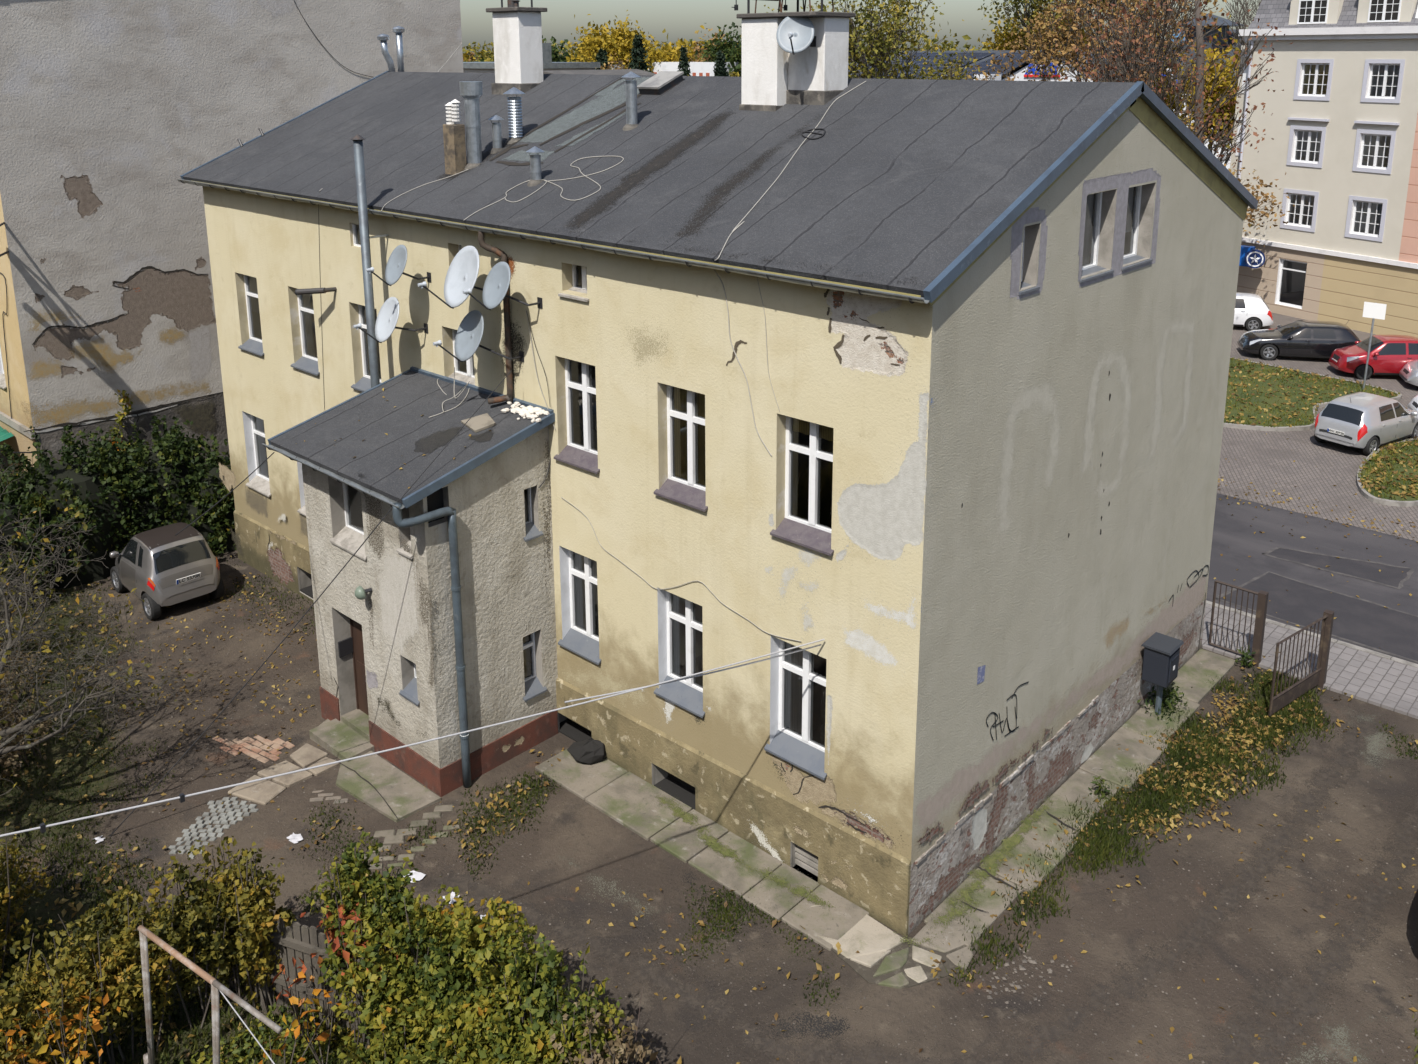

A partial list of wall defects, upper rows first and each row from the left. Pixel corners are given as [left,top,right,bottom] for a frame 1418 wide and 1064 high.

flaking render [60,174,103,219]
leakage [437,135,533,181]
leakage [481,106,873,279]
flaking render [20,256,216,433]
crack [726,340,747,366]
flaking render [824,289,909,377]
flaking render [770,754,896,848]
flaking render [916,727,1075,923]